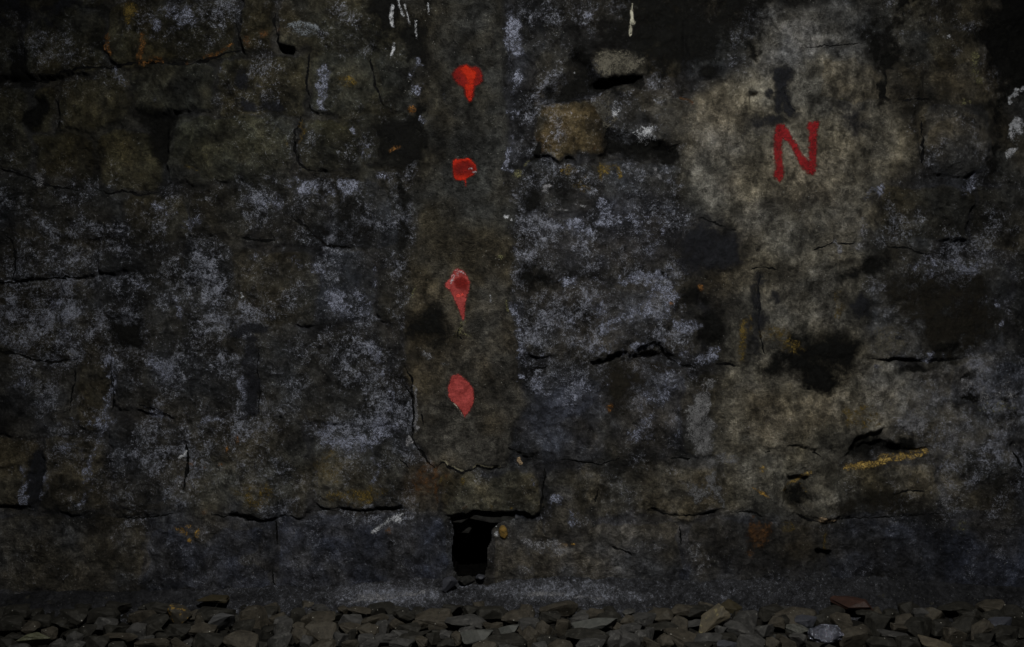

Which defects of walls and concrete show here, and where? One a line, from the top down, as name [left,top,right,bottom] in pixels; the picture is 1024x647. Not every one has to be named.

crack [592,341,736,368]
crack [400,367,518,474]
rust [844,448,928,471]